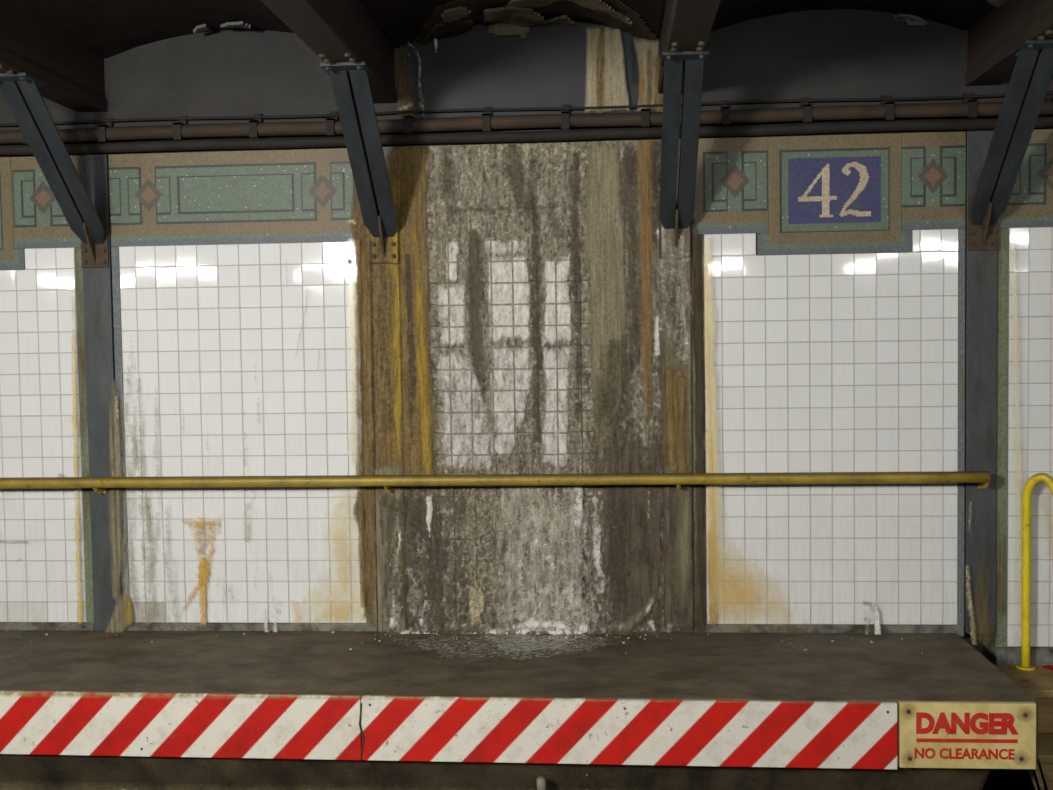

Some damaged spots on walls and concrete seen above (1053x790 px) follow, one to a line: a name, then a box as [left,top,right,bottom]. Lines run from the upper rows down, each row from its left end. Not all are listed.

peeling [414,0,663,113]
water stain [394,142,705,660]
water stain [123,499,154,600]
corrosion [188,519,219,625]